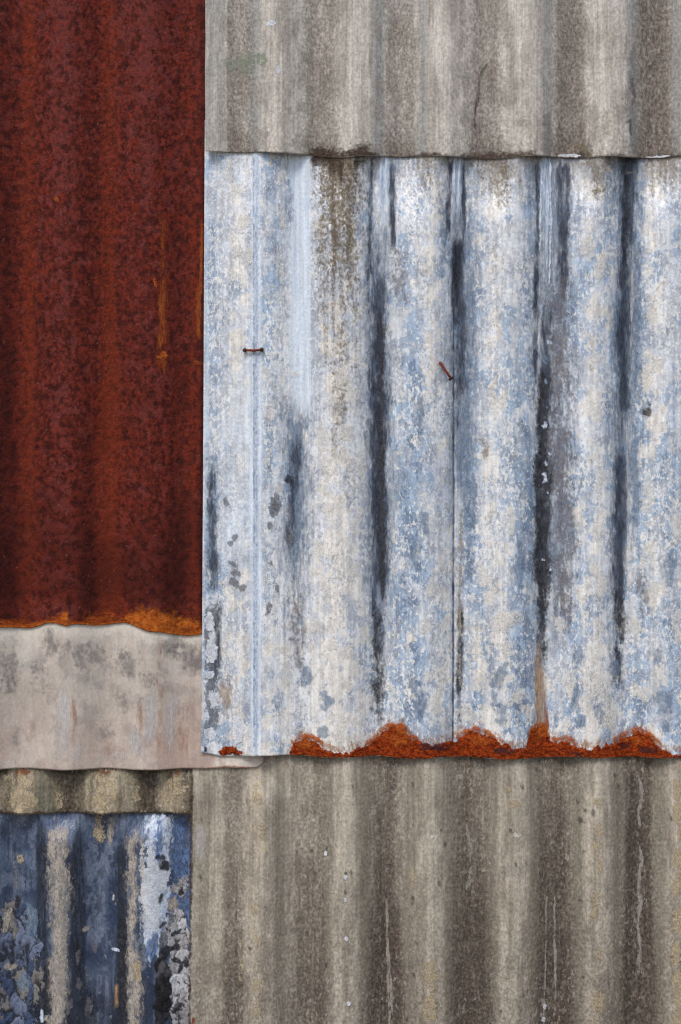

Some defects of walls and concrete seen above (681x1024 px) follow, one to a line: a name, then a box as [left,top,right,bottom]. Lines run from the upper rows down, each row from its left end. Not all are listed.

peeling [2,774,38,810]
rust [0,610,202,636]
rust [153,226,168,372]
rust [196,222,204,339]
water stain [193,456,221,730]
water stain [285,420,306,580]
water stain [312,156,407,721]
water stain [439,161,477,742]
rust [289,648,681,759]
water stain [515,108,675,685]
peeling [0,827,97,1024]
peeling [91,769,202,1024]